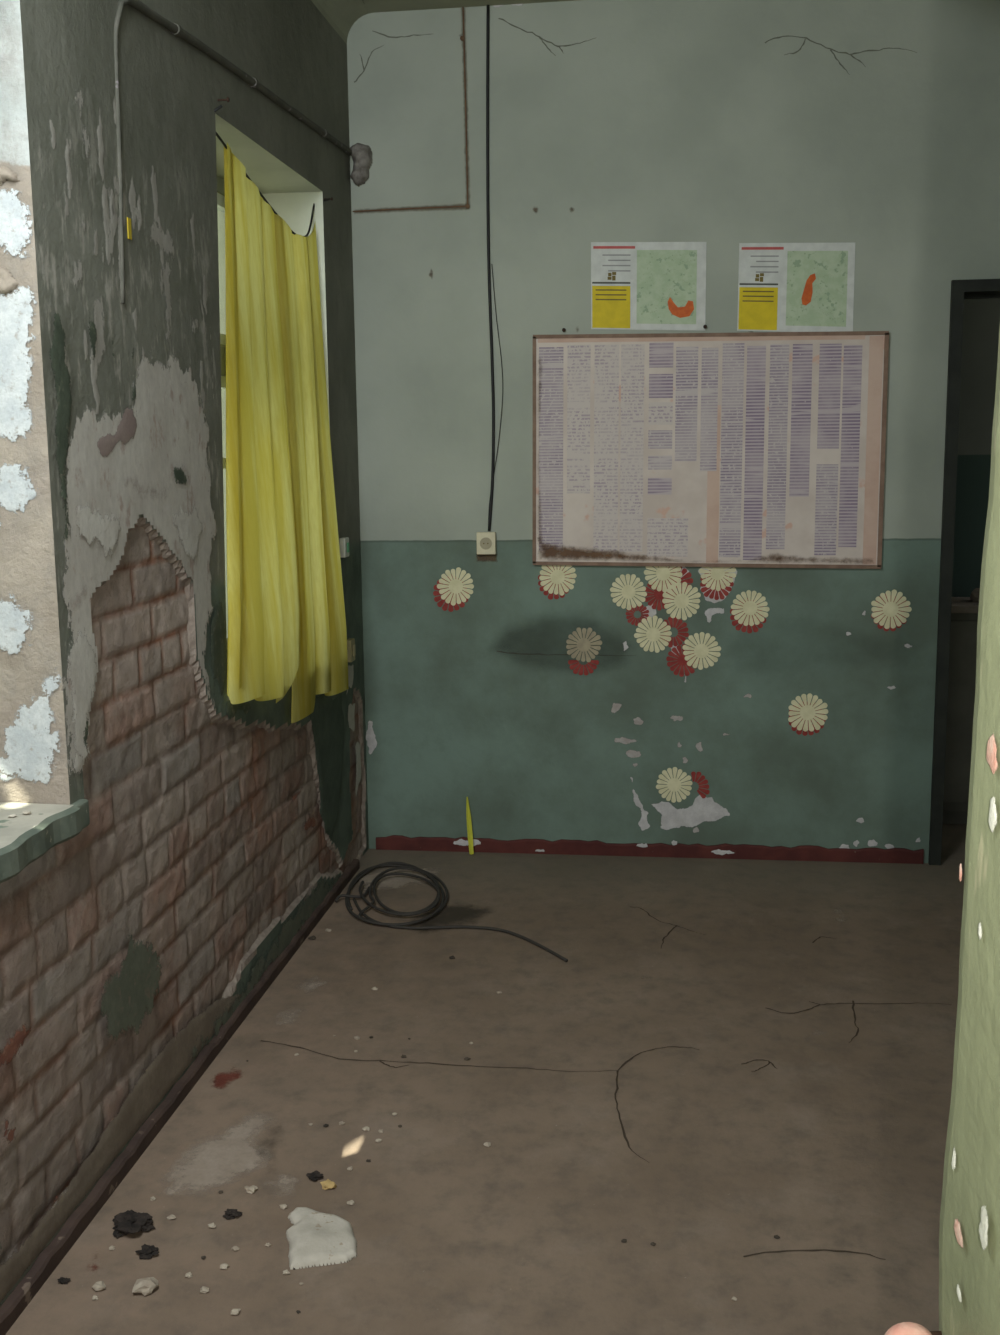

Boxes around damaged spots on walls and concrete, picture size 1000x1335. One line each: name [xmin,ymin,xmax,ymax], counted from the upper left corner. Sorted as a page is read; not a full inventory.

crack [499,18,594,56]
crack [765,35,917,75]
flaking render [0,90,377,1265]
spalling [614,717,730,847]
crack [261,1040,699,1162]